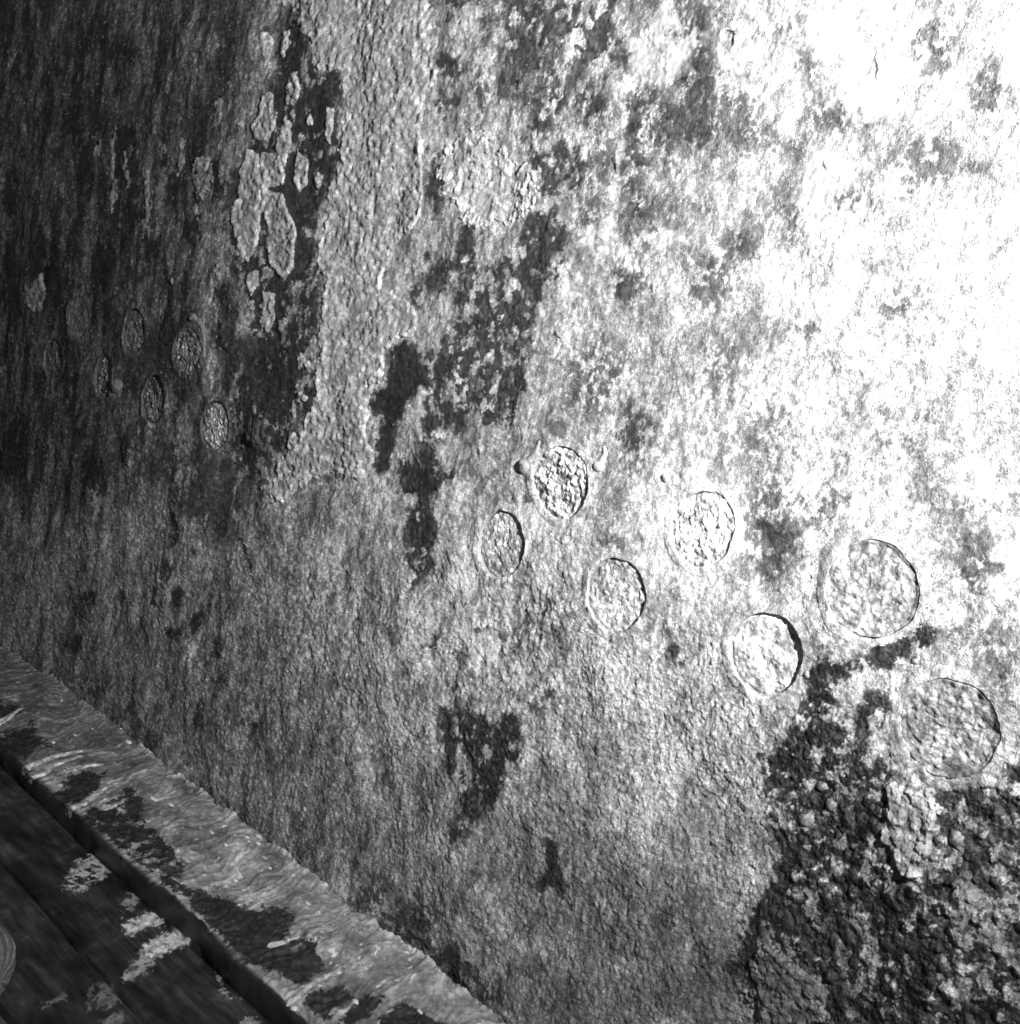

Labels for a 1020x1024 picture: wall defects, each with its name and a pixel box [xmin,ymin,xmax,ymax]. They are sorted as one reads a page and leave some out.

leakage [367,0,718,591]
leakage [755,521,800,583]
leakage [959,530,1005,596]
leakage [518,585,561,710]
leakage [664,626,685,667]
leakage [437,679,522,849]
leakage [725,624,1020,1024]